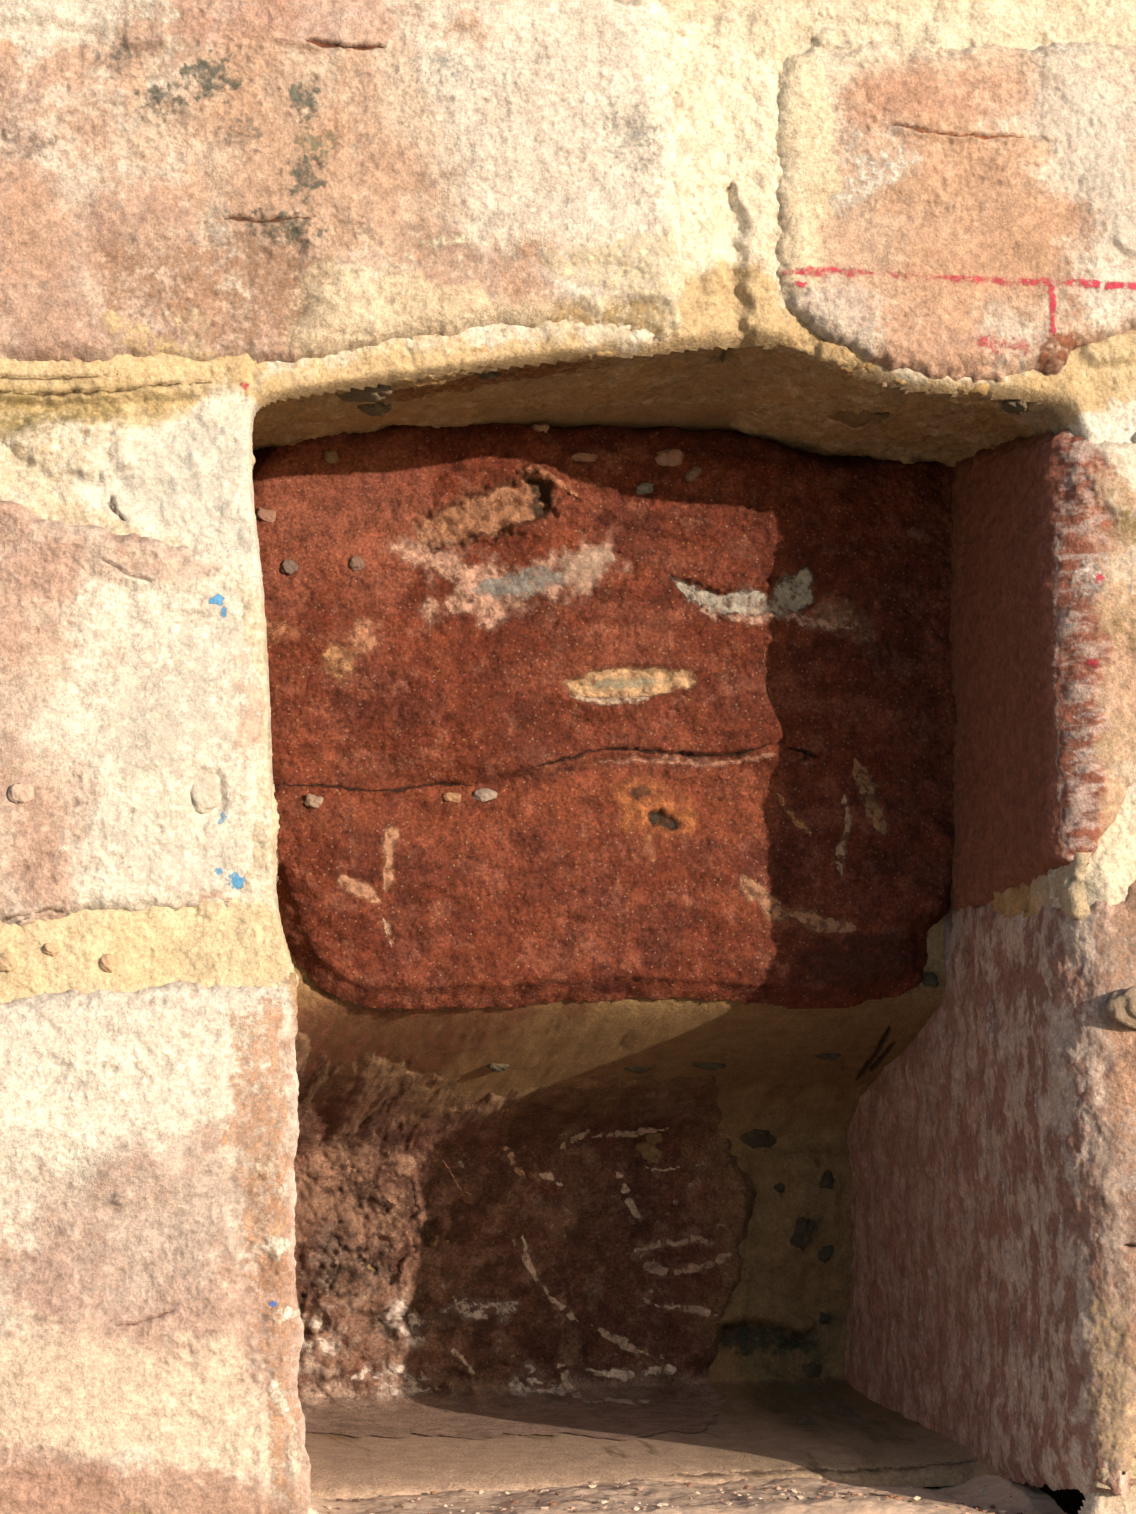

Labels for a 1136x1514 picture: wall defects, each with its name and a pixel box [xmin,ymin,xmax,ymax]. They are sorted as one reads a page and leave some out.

crack [307,40,384,50]
crack [894,124,1020,139]
crack [227,215,314,223]
crack [537,652,817,766]
crack [275,782,471,792]